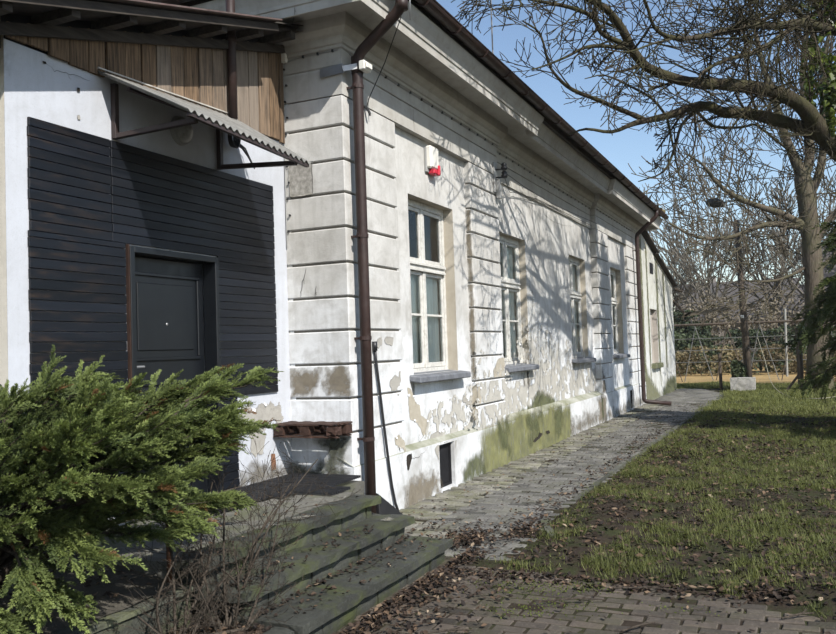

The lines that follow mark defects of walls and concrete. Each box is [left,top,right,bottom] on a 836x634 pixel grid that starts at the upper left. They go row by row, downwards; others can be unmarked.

peeling [239,401,283,470]
peeling [390,300,597,460]